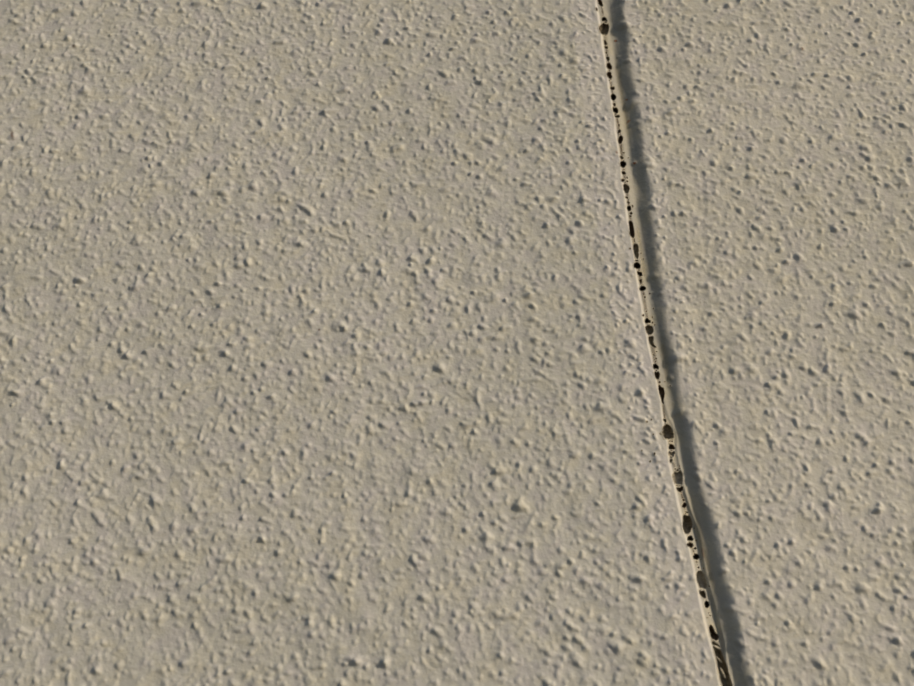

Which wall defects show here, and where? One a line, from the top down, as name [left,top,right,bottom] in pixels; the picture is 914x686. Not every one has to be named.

crack [595,0,711,619]